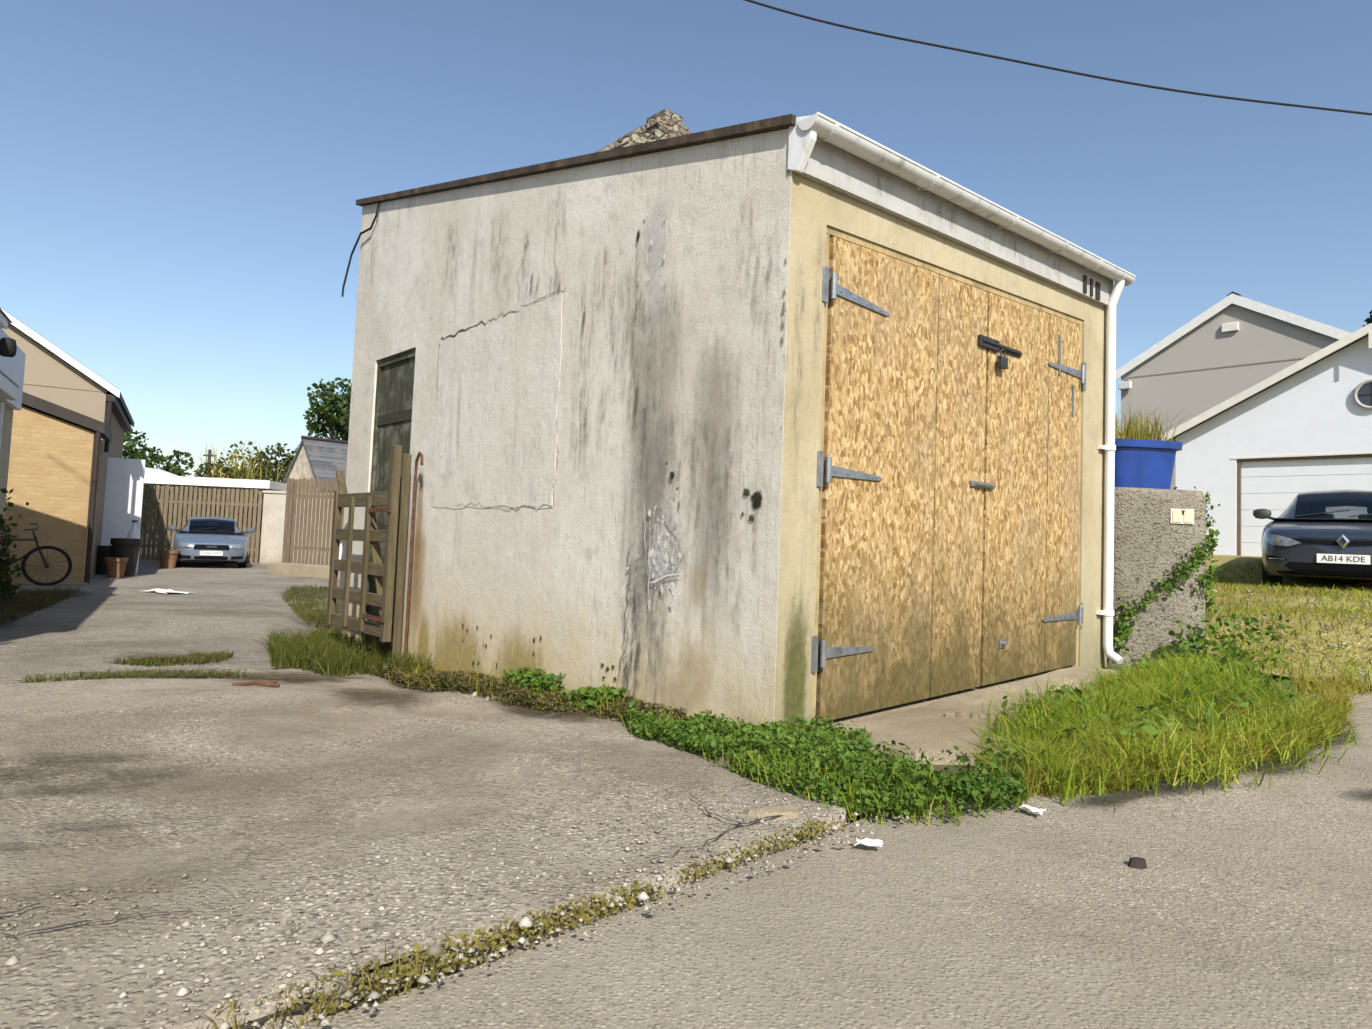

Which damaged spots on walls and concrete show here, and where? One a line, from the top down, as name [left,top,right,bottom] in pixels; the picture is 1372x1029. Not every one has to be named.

crack [434,207,564,436]
crack [456,377,560,511]
peeling [627,490,687,609]
water stain [437,626,475,676]
water stain [500,643,535,682]